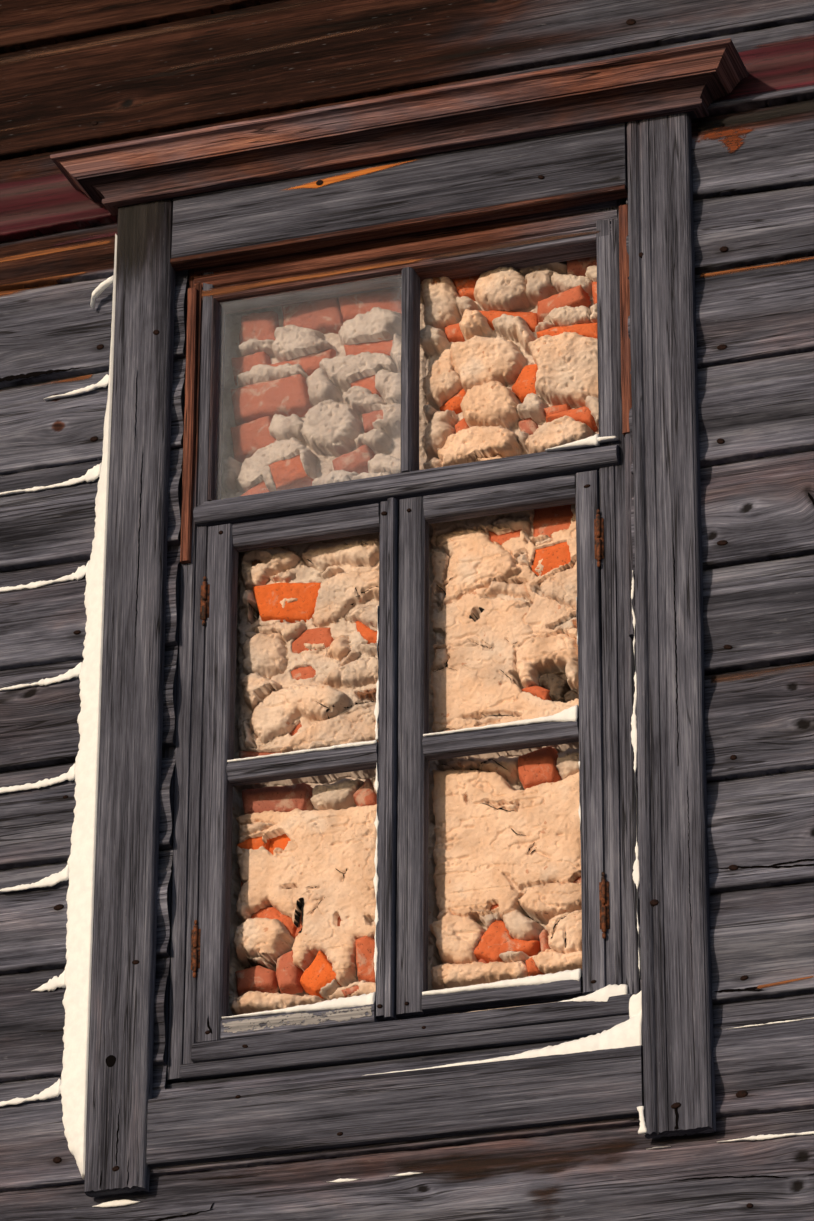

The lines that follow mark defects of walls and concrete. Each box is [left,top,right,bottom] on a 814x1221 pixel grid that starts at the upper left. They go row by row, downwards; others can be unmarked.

rust [698,126,753,154]
spalling [540,672,579,703]
crack [673,531,763,993]
crack [719,859,814,869]